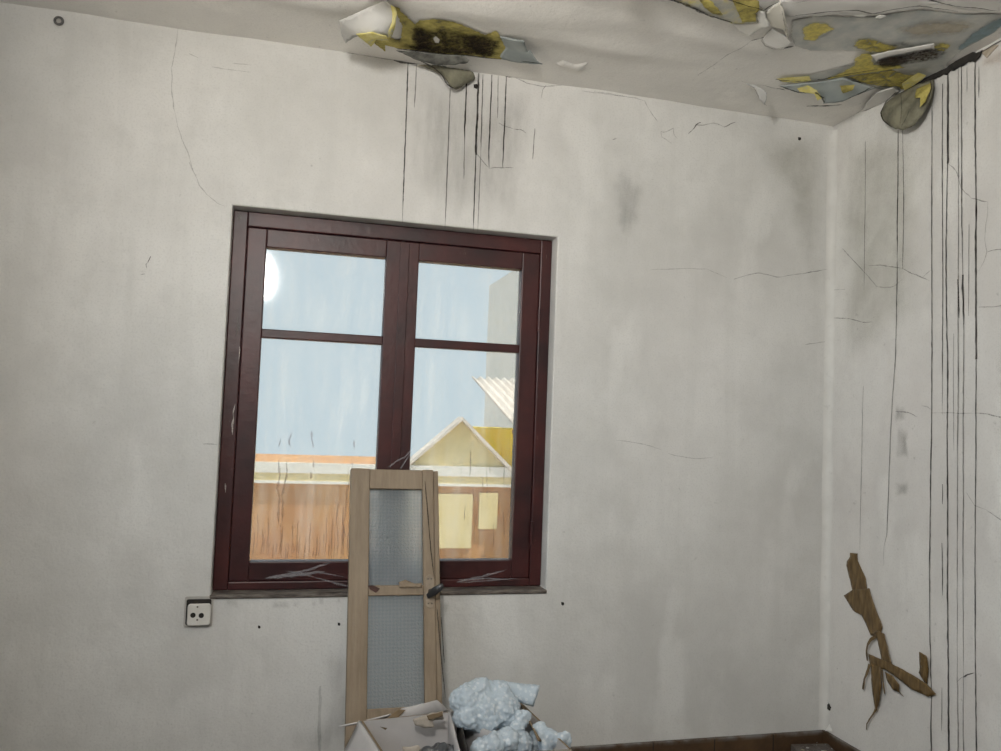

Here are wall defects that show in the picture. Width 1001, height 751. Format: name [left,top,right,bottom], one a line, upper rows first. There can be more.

peeling [339,0,397,46]
peeling [397,50,475,89]
peeling [500,36,542,64]
peeling [734,0,1001,49]
peeling [780,77,934,130]
leakage [402,66,416,220]
leakage [464,73,492,230]
leakage [896,169,904,330]
leakage [929,64,979,751]